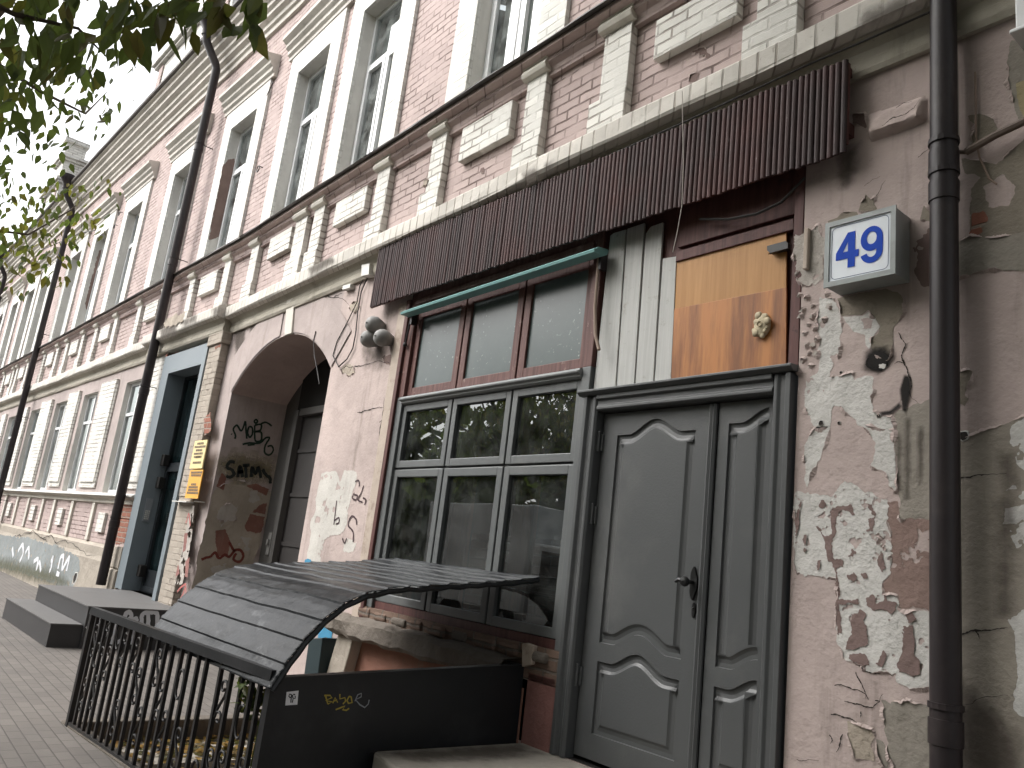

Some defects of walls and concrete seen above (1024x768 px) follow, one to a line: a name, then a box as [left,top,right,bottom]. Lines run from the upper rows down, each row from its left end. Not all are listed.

spalling [959,139,1024,280]
crack [896,333,917,402]
peeling [307,470,357,562]
peeling [791,195,929,768]
spalling [960,414,1024,768]
crack [797,667,883,761]